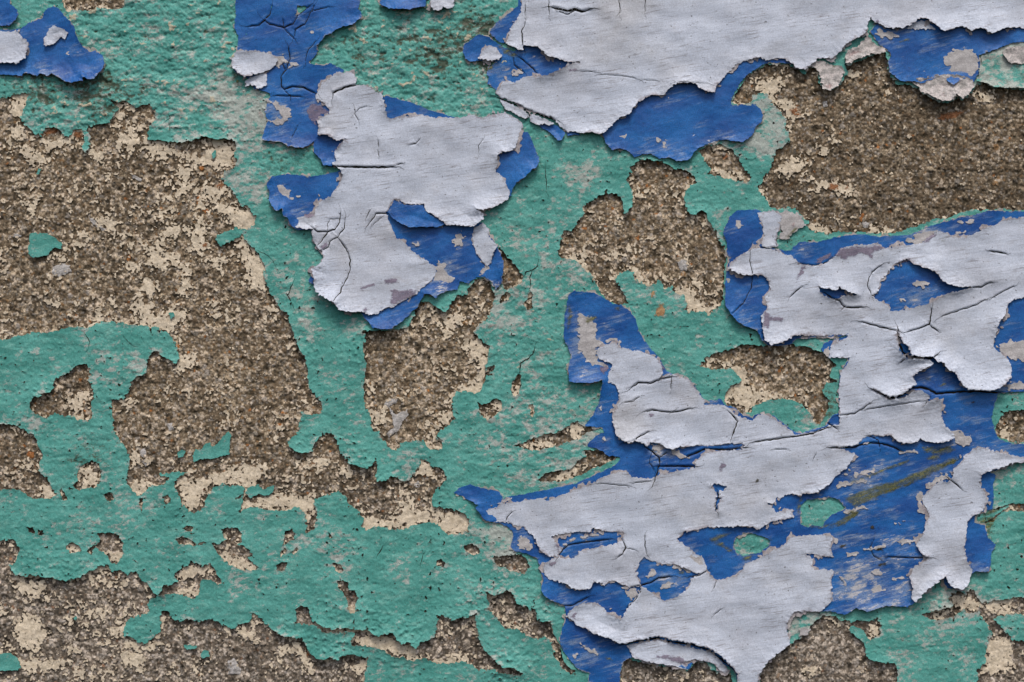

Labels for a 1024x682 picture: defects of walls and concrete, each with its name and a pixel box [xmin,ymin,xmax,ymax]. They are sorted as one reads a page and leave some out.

peeling [0,0,125,84]
crack [322,137,421,169]
crack [493,95,563,124]
spalling [0,93,469,535]
crack [307,205,393,309]
peeling [230,0,1024,682]
crack [729,233,1019,363]
spalling [0,525,523,682]
crack [554,538,725,618]